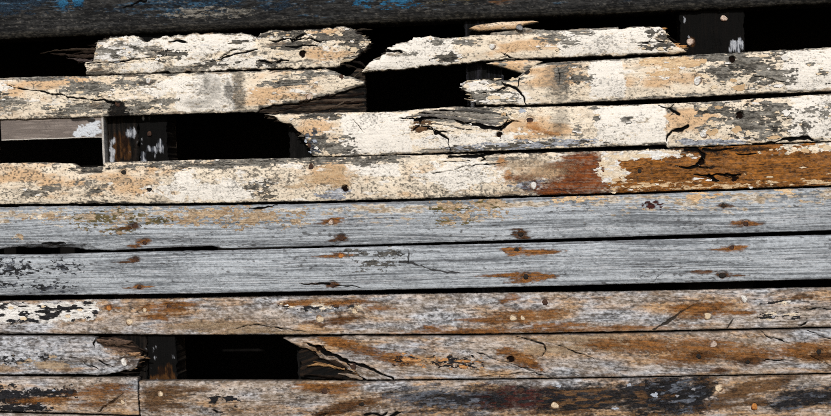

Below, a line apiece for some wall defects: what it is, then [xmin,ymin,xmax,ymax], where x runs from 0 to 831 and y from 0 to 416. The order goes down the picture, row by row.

peeling [41,36,190,116]
crack [205,34,322,64]
peeling [191,28,371,88]
crack [400,110,514,174]
peeling [409,26,831,210]
crack [658,104,814,182]
peeling [0,256,99,327]
rust [119,239,150,263]
rust [483,272,559,283]
rust [501,228,561,256]
crack [236,324,394,379]
peeling [0,381,80,412]